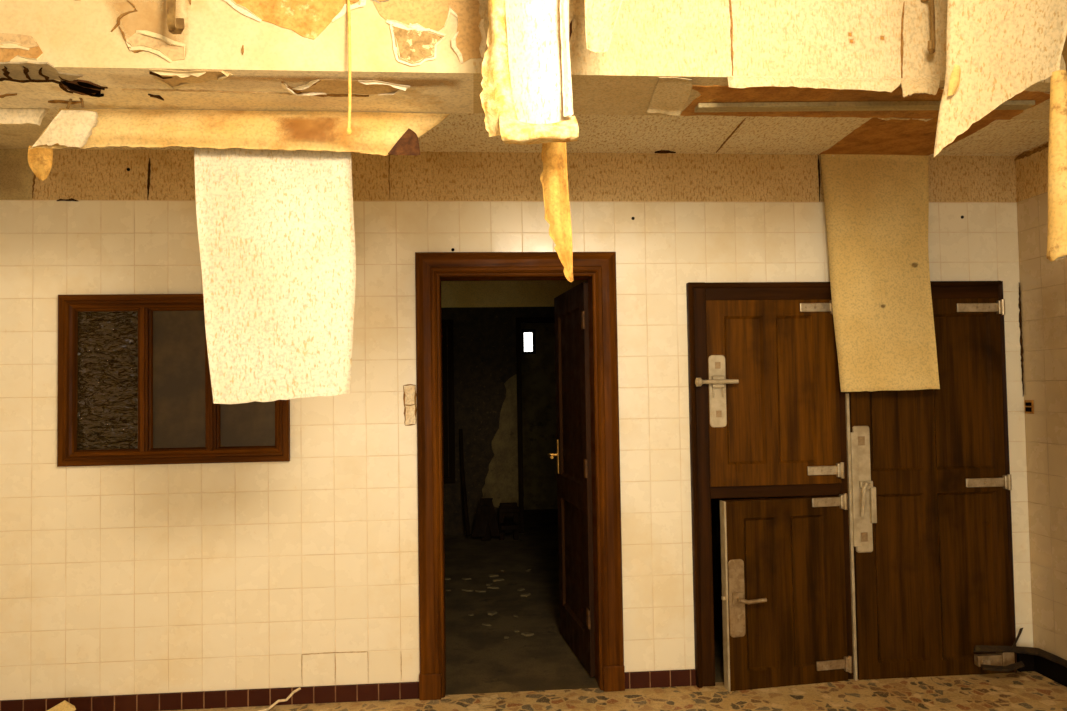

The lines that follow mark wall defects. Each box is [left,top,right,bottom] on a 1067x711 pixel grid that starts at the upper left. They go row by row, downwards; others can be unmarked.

peeling [224,0,487,66]
spalling [569,12,578,48]
peeling [0,30,450,156]
peeling [681,77,1050,156]